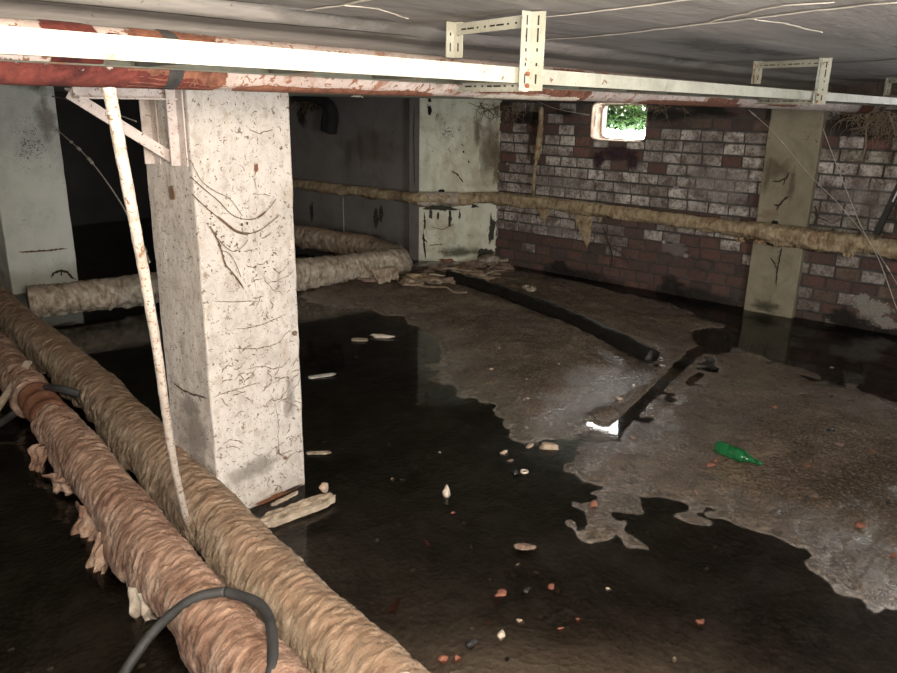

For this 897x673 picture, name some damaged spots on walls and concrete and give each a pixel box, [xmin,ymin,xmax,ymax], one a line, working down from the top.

corrosion [37,19,223,43]
crack [30,0,421,38]
crack [545,0,897,40]
corrosion [0,57,434,97]
corrosion [478,89,592,101]
corrosion [638,98,742,107]
corrosion [856,105,875,114]
water stain [475,123,499,176]
water stain [423,204,479,226]
water stain [442,215,496,257]
crack [770,247,782,285]
crack [174,232,302,488]